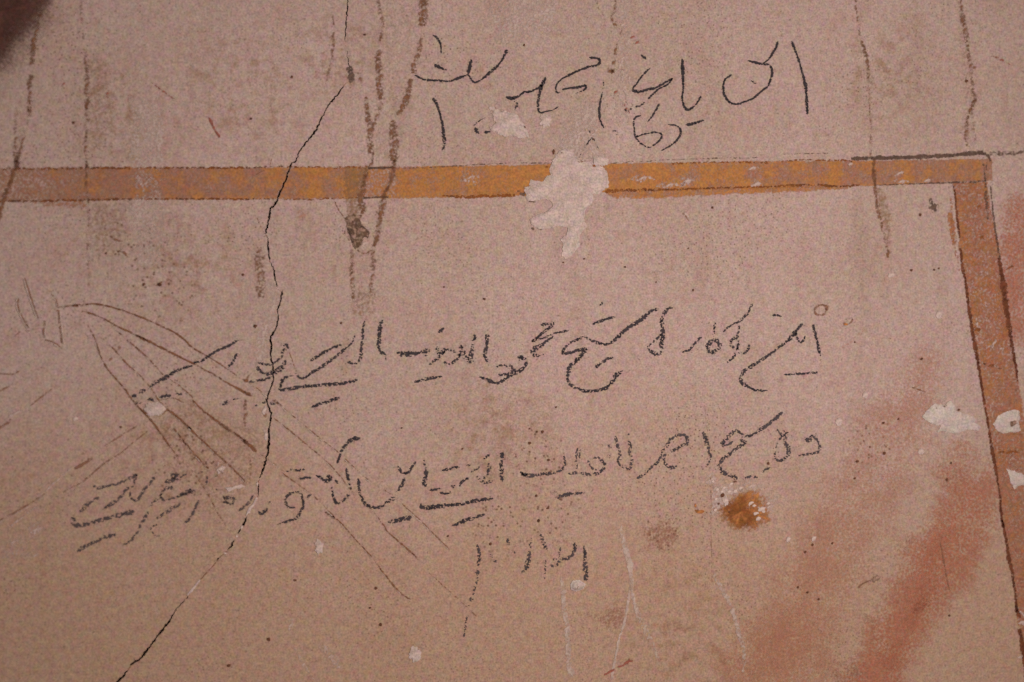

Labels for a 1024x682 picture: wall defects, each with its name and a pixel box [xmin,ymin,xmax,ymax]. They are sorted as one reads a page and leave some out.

damp [346,0,428,299]
flaking render [489,107,530,139]
flaking render [518,105,609,263]
crack [116,0,361,682]
flaking render [922,401,1021,434]
rust [694,473,779,531]